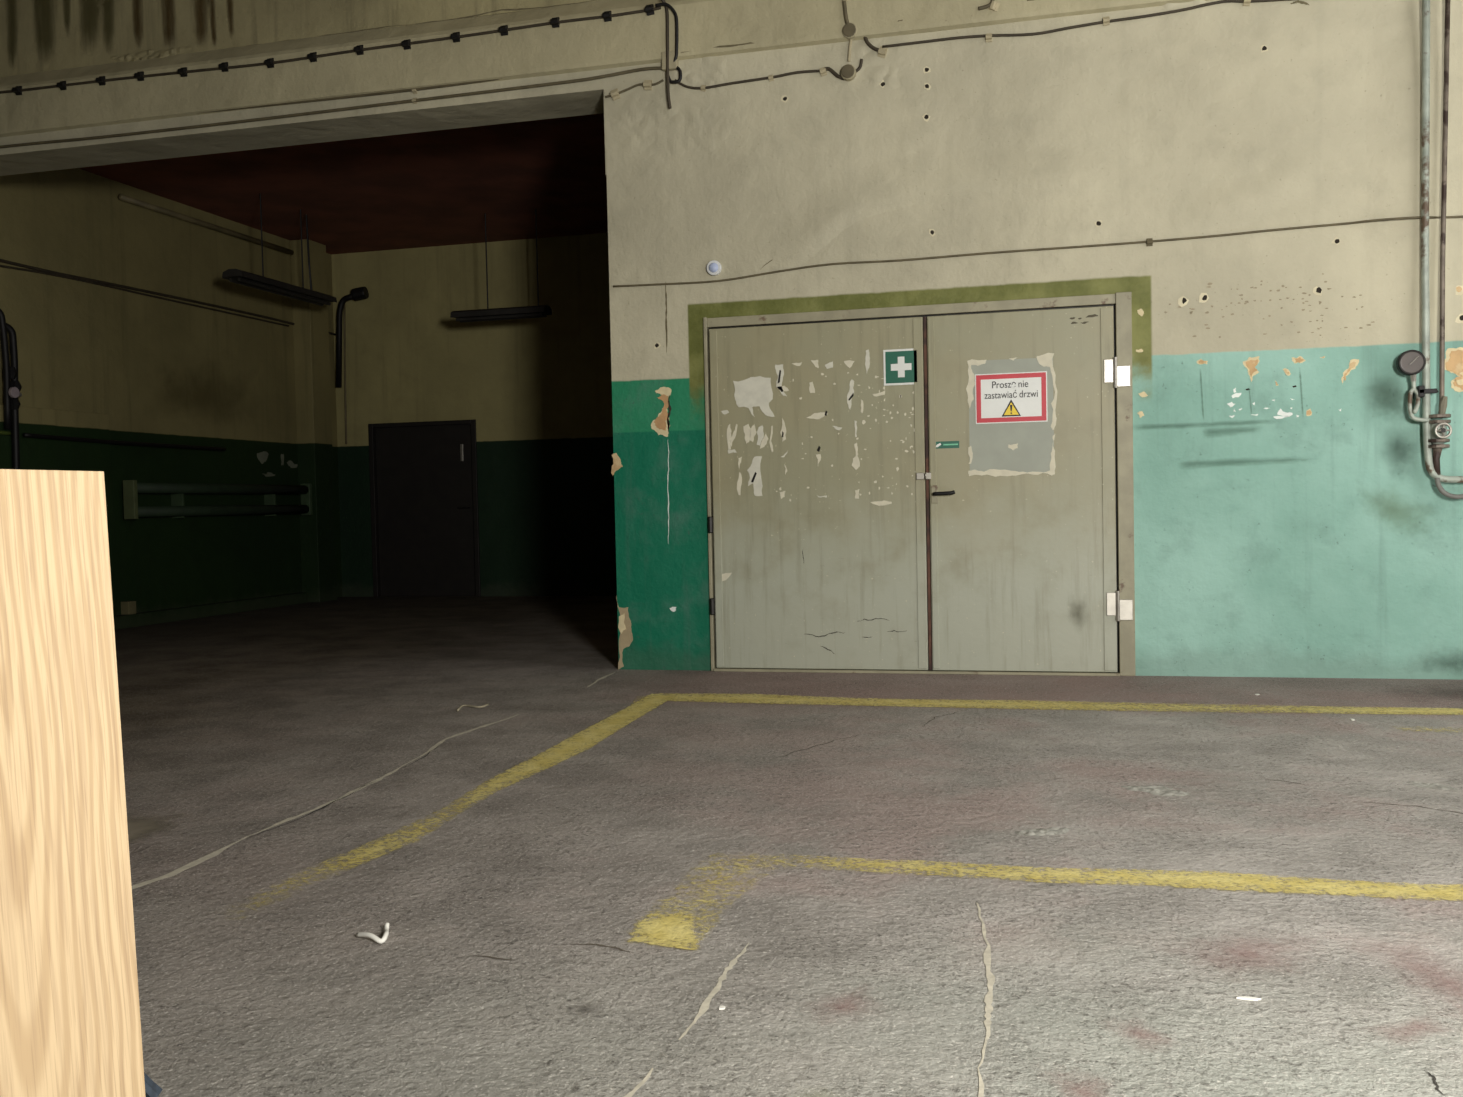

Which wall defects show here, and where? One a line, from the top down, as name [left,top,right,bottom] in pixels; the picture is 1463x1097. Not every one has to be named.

leakage [35,0,112,48]
leakage [163,0,173,41]
leakage [195,0,232,42]
spalling [1164,273,1374,338]
peeling [1227,356,1325,419]
peeling [1341,359,1359,384]
peeling [1445,347,1463,392]
peeling [651,387,671,437]
flaking render [616,596,633,669]
crack [976,903,995,1097]
crack [1424,1070,1444,1095]